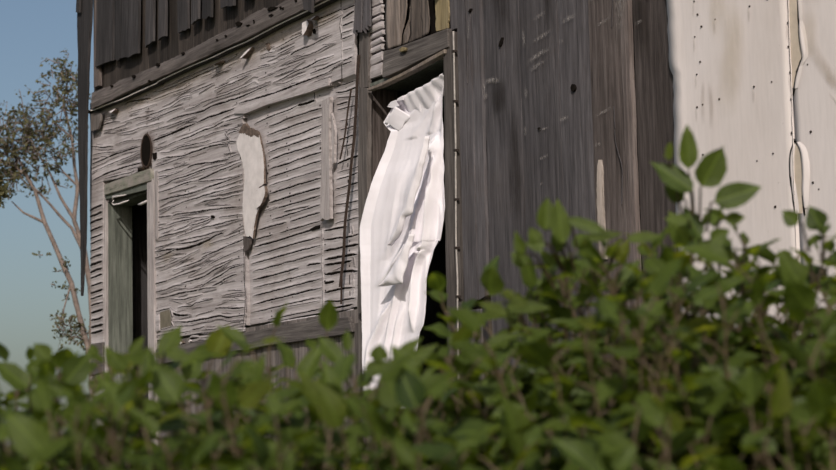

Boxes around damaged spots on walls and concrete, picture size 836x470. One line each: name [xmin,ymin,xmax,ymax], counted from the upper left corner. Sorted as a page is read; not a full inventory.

spalling [239,123,261,138]
crack [790,136,798,250]